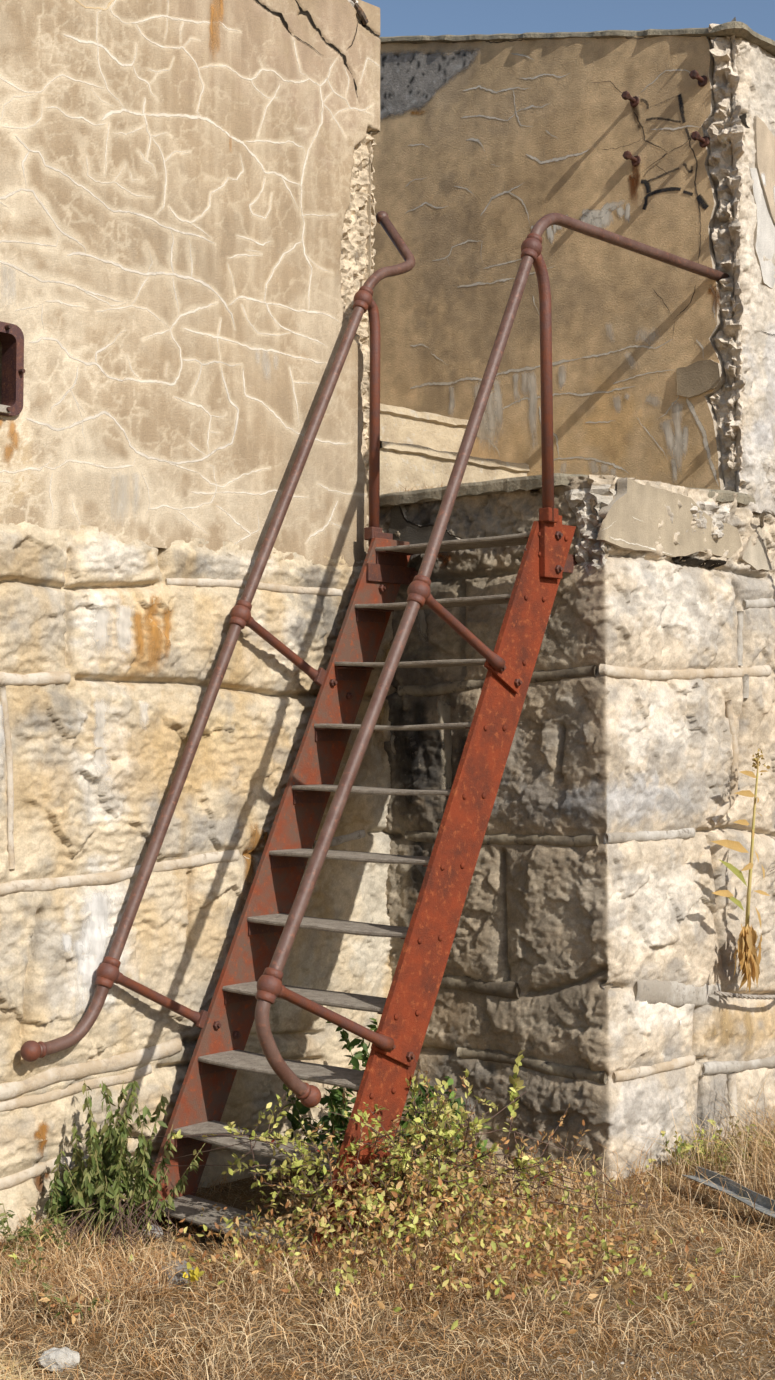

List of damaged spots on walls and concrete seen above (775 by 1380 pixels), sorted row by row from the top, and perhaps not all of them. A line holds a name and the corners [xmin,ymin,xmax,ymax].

rust [210,0,223,43]
rust [629,166,640,197]
crack [0,0,380,545]
crack [406,38,719,486]
spalling [564,17,775,576]
spalling [340,127,377,552]
flaking render [389,505,460,545]
crack [399,507,461,538]
rust [135,599,171,659]